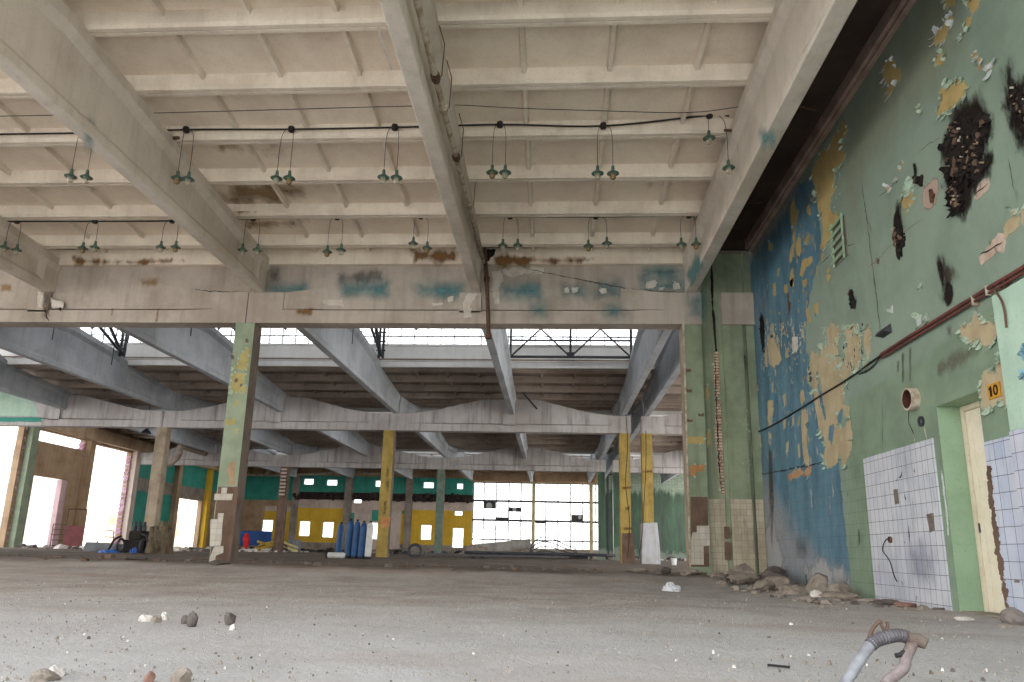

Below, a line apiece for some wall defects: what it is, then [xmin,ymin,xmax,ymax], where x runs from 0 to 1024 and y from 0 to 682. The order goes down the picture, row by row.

peeling [879,0,995,218]
peeling [742,120,872,492]
peeling [224,338,250,434]
peeling [954,310,1007,416]
flaking render [209,461,239,562]
flaking render [690,497,708,537]
flaking render [691,546,709,567]
peeling [724,526,732,560]